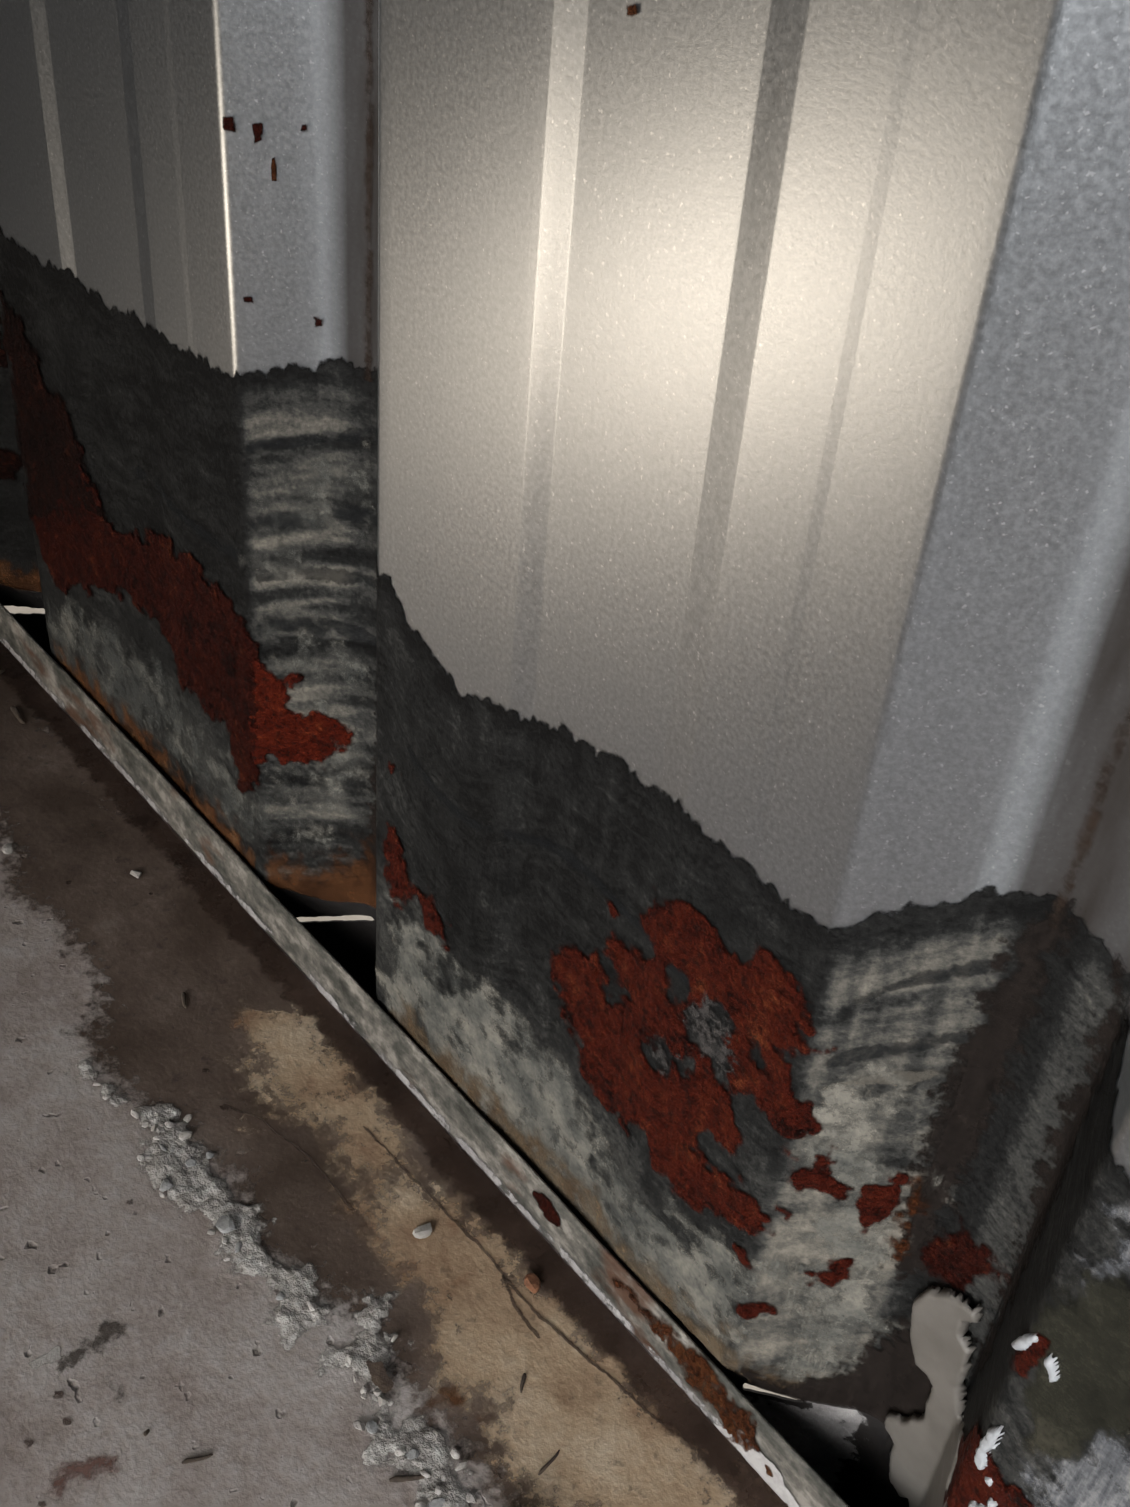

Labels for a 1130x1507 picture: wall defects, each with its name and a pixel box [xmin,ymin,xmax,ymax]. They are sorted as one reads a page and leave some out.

rust [222,117,263,143]
leakage [0,227,378,881]
rust [0,290,1010,1507]
leakage [0,675,608,1507]
leakage [374,566,1130,1507]
spalling [66,1056,333,1351]
spalling [316,1290,477,1507]
peeling [884,1285,1005,1507]
rust [1009,1334,1051,1379]
peeling [1011,1333,1060,1382]
rust [943,1422,1130,1507]